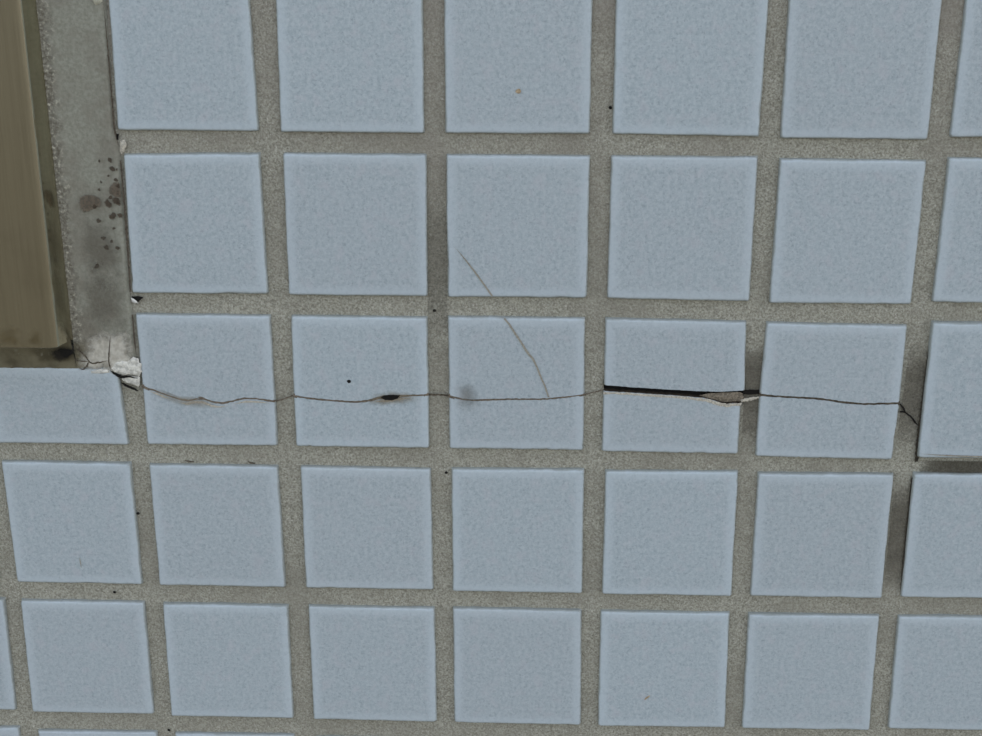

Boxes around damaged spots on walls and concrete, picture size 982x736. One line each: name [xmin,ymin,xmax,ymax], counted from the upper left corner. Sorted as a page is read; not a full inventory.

crack [457,250,493,296]
peeling [91,357,142,387]
crack [141,318,982,590]